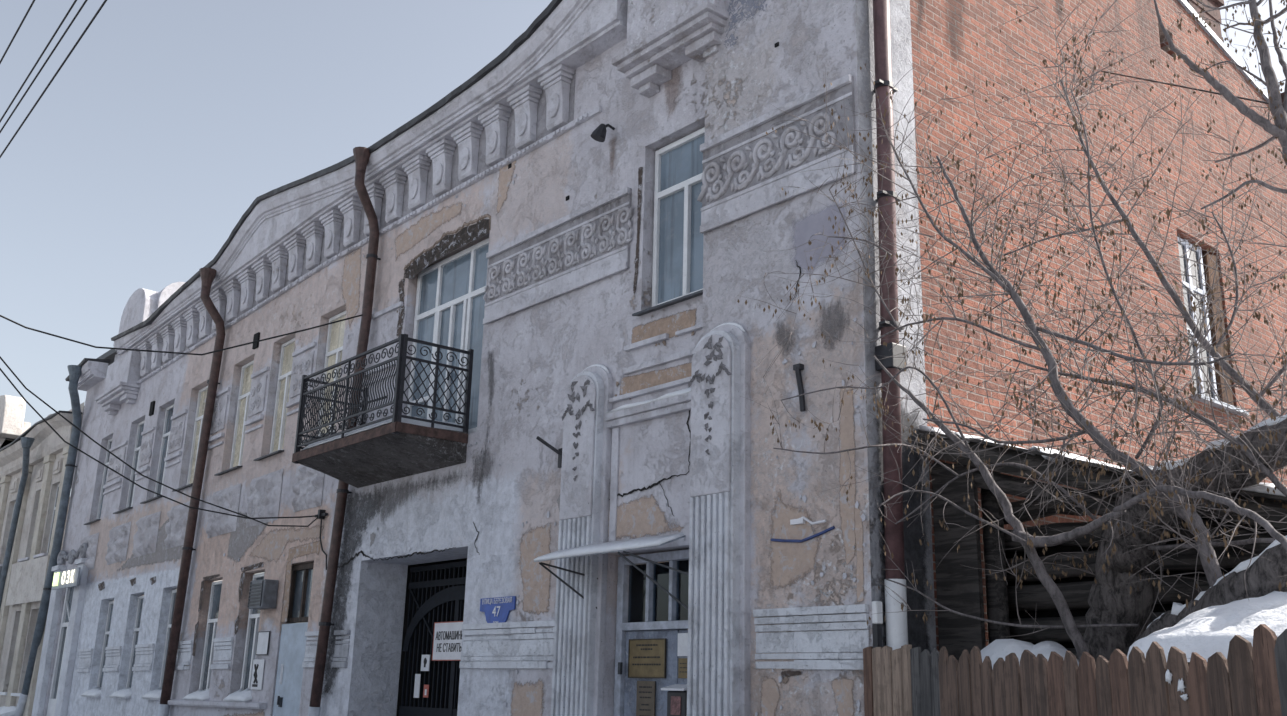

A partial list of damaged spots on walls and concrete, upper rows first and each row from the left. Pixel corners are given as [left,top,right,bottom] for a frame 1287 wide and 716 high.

crack [609,410,691,516]
peeling [516,496,560,614]
peeling [608,495,685,541]
peeling [769,492,826,592]
peeling [504,670,544,716]
spalling [781,669,802,684]